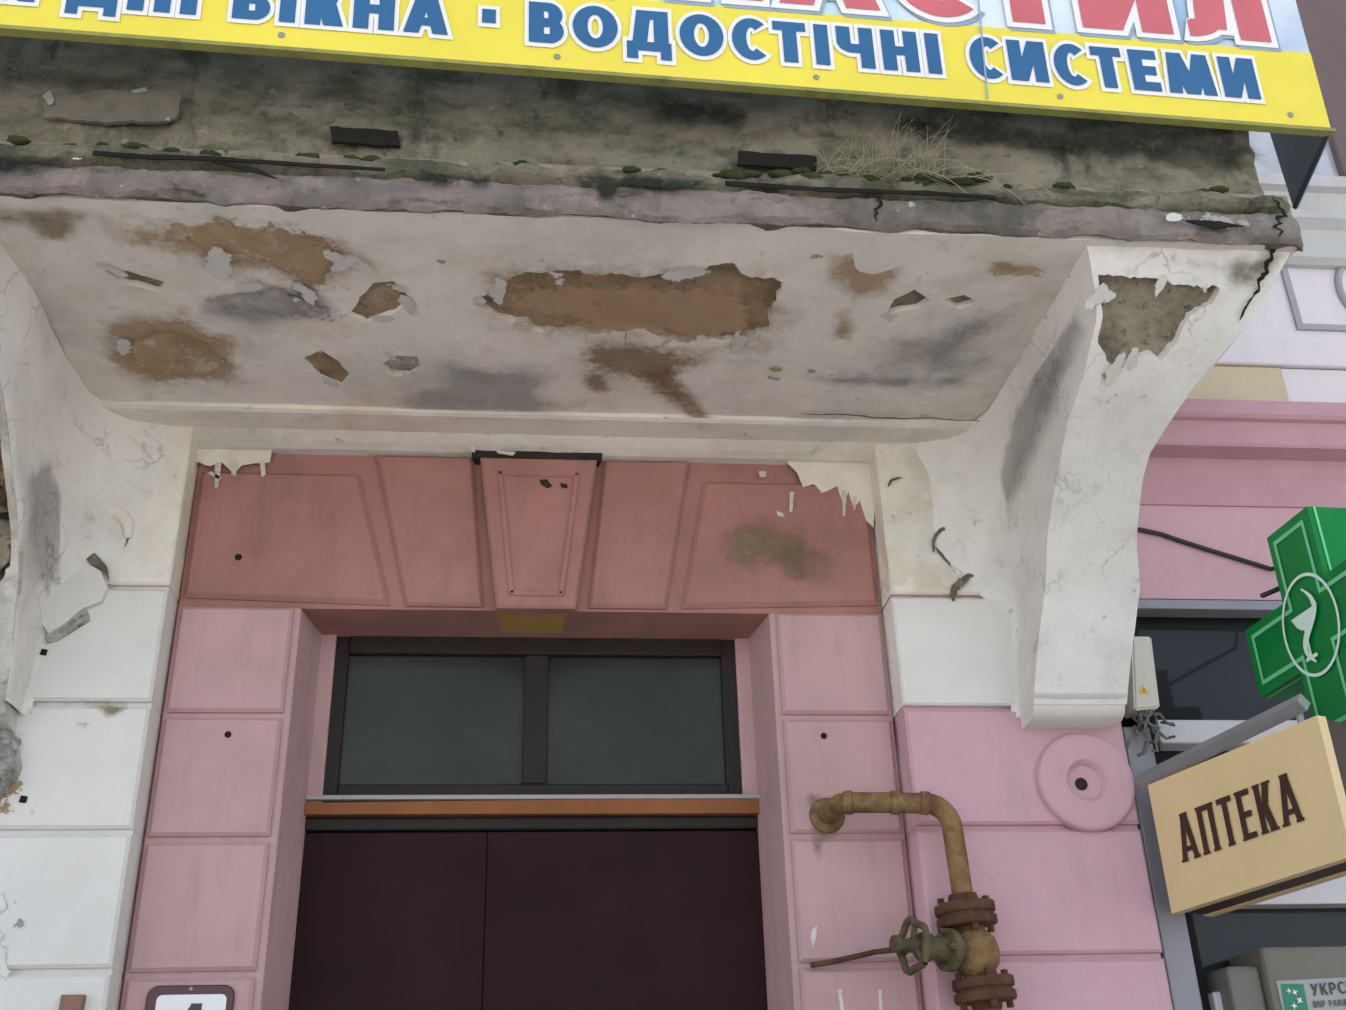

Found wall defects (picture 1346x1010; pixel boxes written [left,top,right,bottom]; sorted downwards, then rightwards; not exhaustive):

damp [658,99,745,129]
damp [903,118,1254,163]
damp [422,172,453,183]
damp [587,174,703,198]
peeling [135,216,415,323]
crack [1239,197,1288,321]
peeling [111,319,235,384]
spalling [305,350,349,388]
spalling [473,263,781,354]
spalling [1084,274,1214,386]
flaking render [0,433,11,588]
peeling [776,462,874,528]